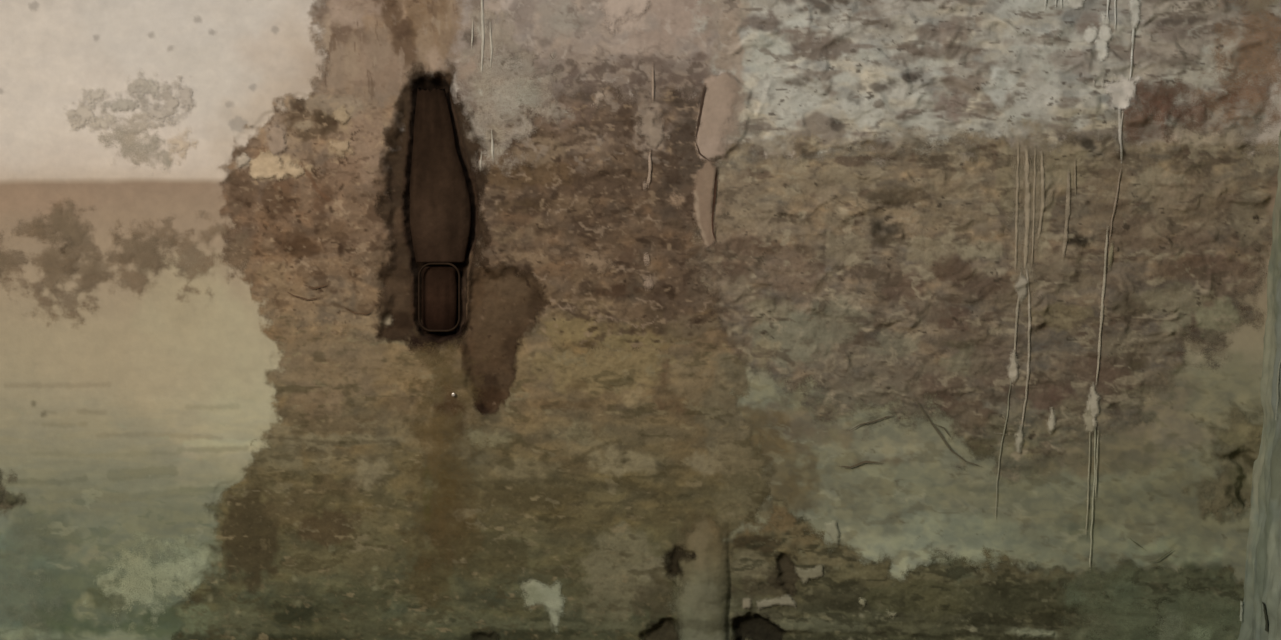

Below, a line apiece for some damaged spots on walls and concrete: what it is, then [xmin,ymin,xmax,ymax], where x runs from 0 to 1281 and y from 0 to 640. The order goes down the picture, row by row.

peeling [447,0,493,109]
peeling [62,69,199,174]
flaking render [695,70,754,167]
leakage [0,197,234,329]
leakage [372,0,577,416]
flaking render [692,160,720,249]
efflorescence [994,135,1076,520]
leakage [1082,107,1123,570]
flaking render [1181,400,1264,524]